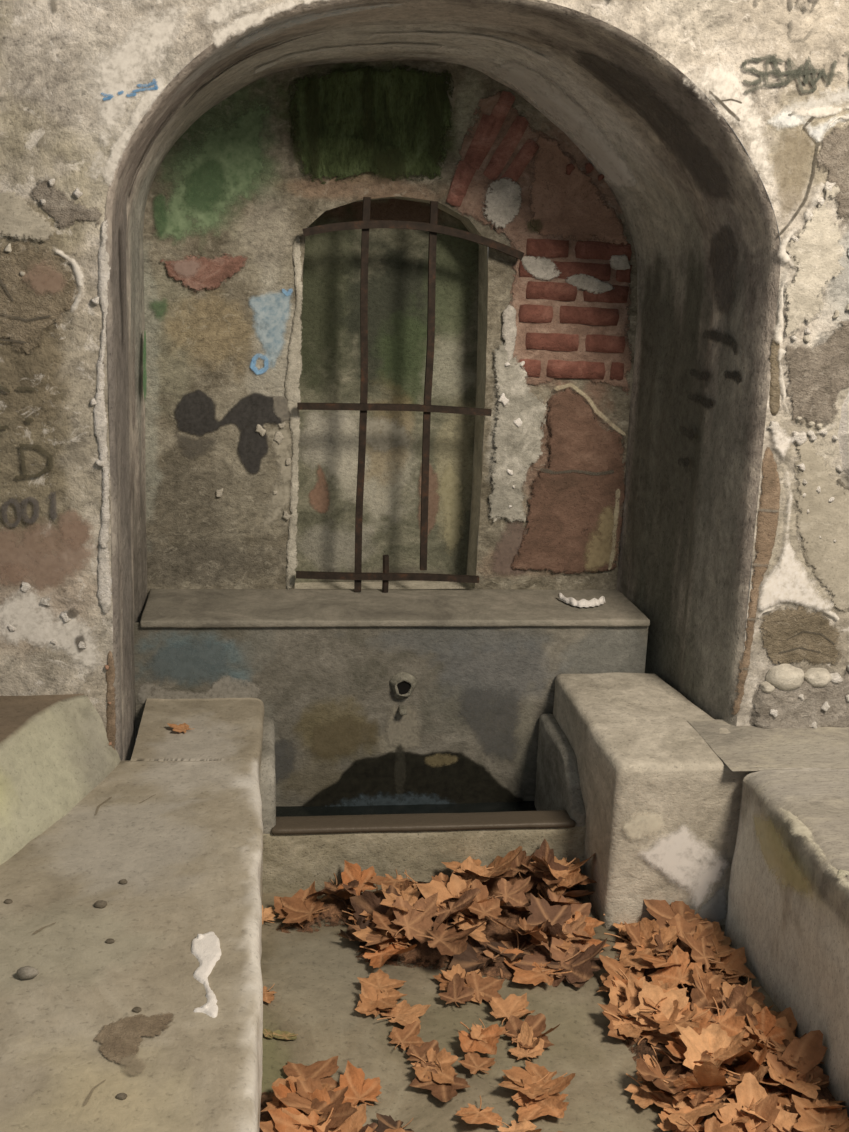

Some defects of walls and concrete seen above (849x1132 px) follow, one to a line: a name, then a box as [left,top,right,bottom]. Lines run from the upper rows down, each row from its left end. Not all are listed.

spalling [804,116,849,224]
spalling [0,240,100,354]
flaking render [446,91,632,575]
spalling [769,304,849,434]
spalling [731,447,849,729]